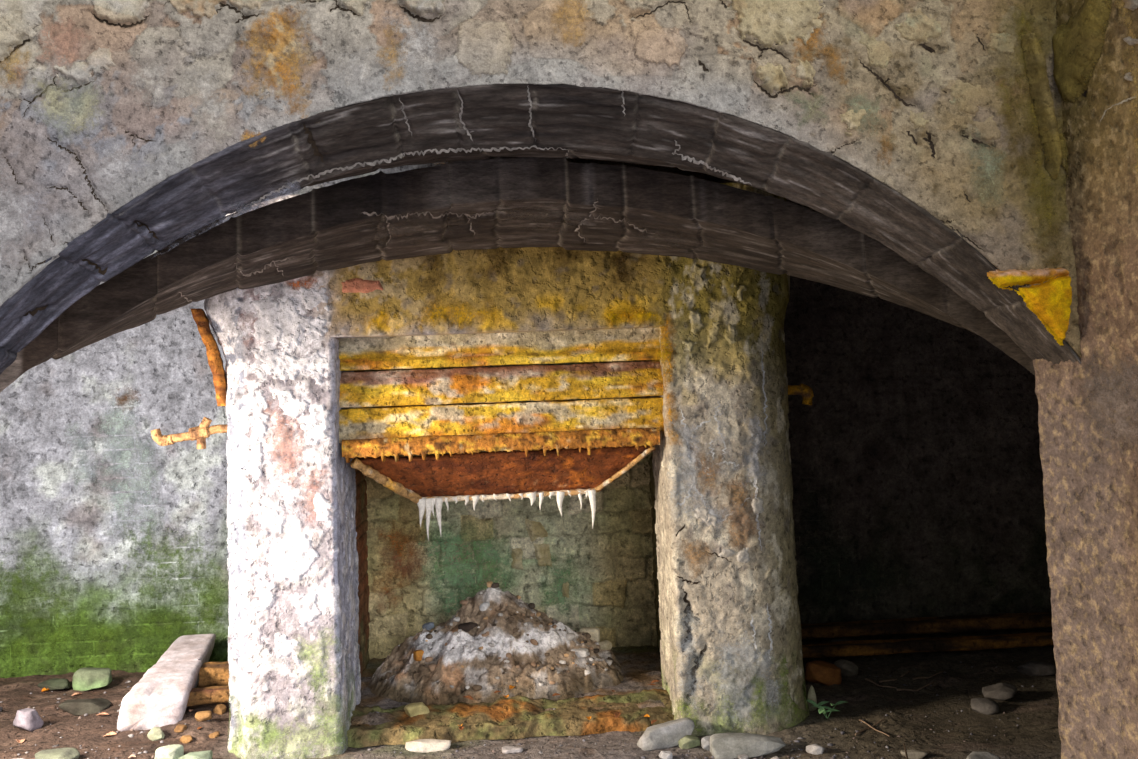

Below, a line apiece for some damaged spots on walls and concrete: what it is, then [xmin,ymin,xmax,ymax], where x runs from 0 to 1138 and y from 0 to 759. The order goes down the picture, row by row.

crack [19,76,94,117]
crack [457,90,474,141]
crack [527,86,536,141]
crack [859,59,936,158]
crack [962,135,991,148]
crack [4,136,108,214]
crack [24,218,108,275]
crack [362,211,504,245]
crack [575,199,655,240]
crack [23,305,48,316]
corrosion [342,308,677,463]
crack [677,576,707,705]